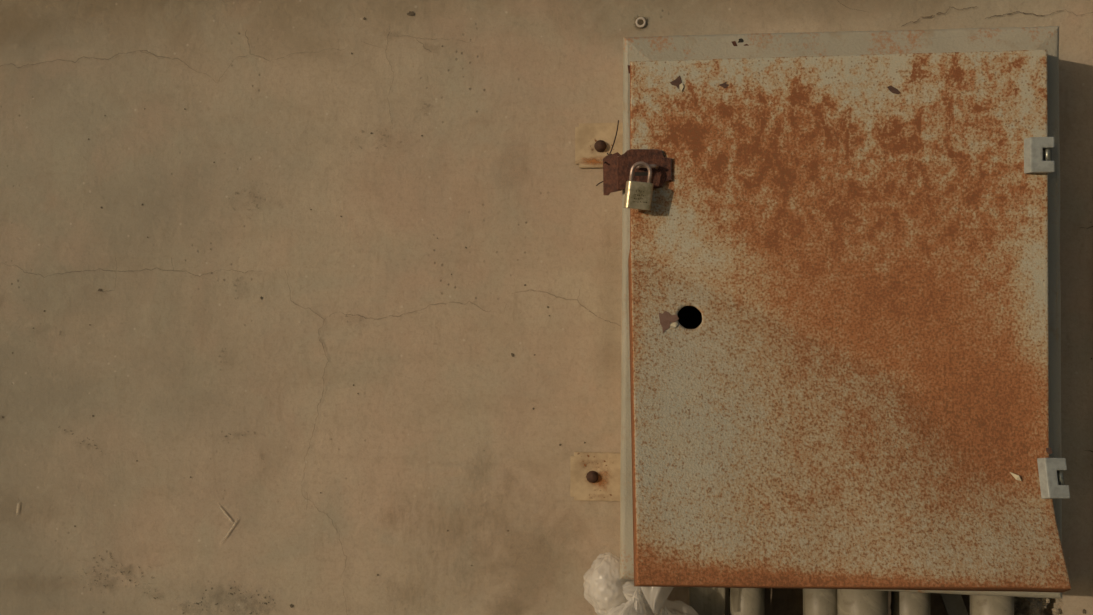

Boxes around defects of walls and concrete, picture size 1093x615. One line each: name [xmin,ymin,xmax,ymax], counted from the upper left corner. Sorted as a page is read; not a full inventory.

crack [970,6,1064,19]